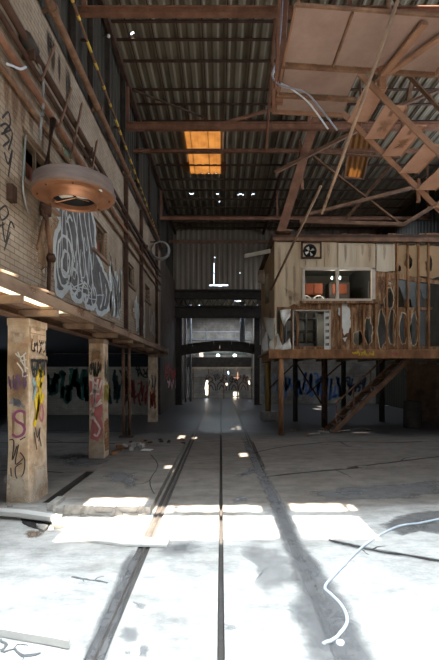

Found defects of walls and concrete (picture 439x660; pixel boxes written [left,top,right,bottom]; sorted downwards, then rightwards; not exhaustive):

peeling [338,304,351,341]
crack [252,441,439,478]
leakage [312,481,439,499]
leakage [384,511,439,535]